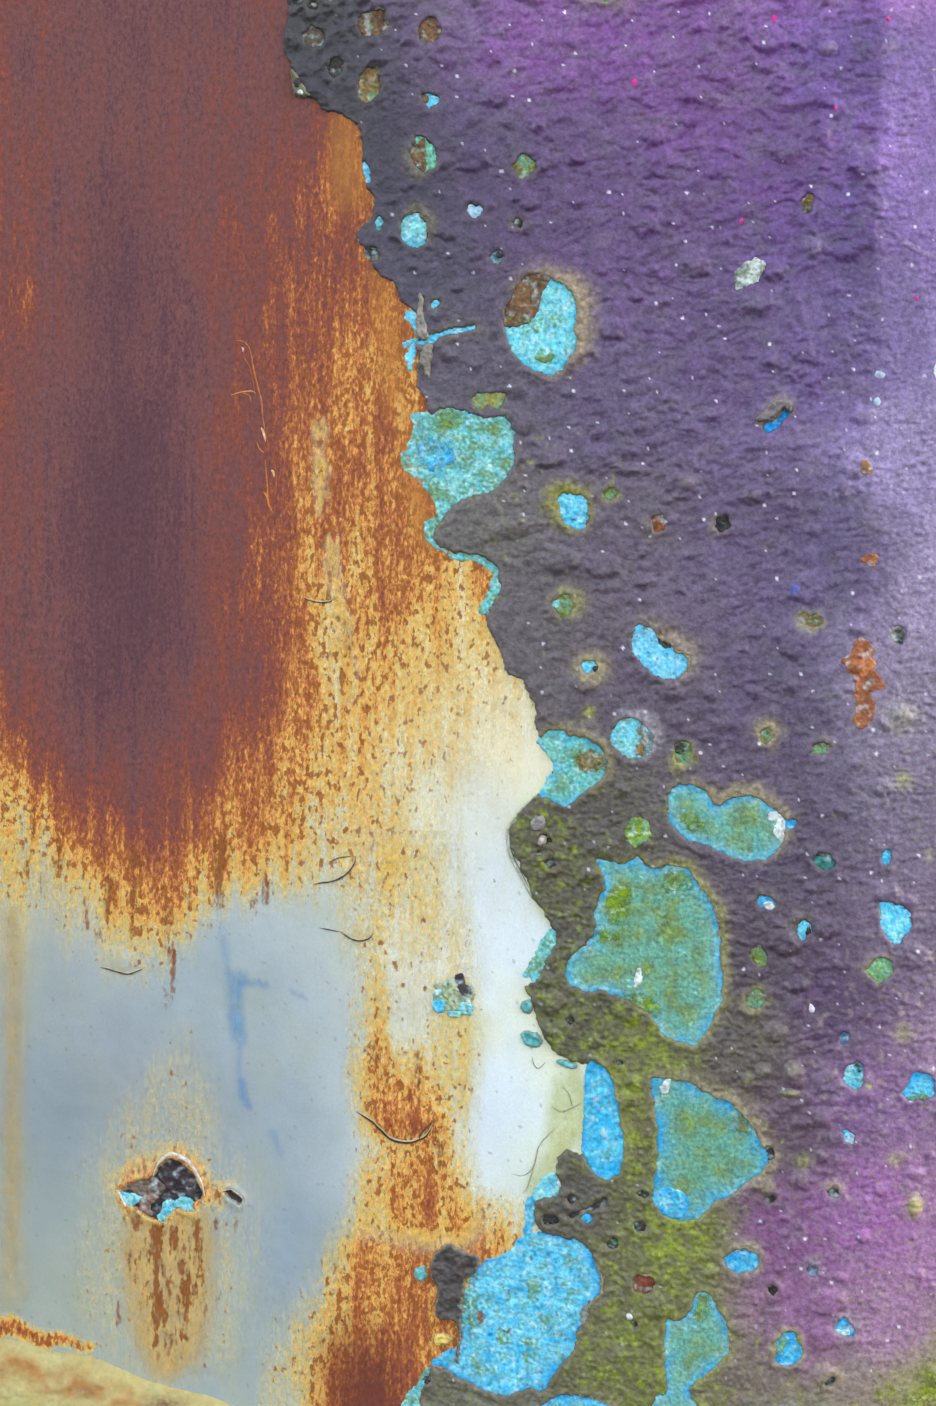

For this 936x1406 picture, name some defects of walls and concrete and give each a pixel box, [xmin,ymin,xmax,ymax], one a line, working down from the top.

peeling [503,274,551,328]
peeling [400,408,516,615]
corrosion [0,0,533,1406]
corrosion [841,637,886,729]
peeling [530,730,607,868]
peeling [667,784,785,862]
peeling [565,856,723,1046]
spalling [116,1152,244,1222]
peeling [556,1059,624,1180]
peeling [637,1078,775,1221]
peeling [401,1172,611,1406]
peeling [652,1292,732,1406]